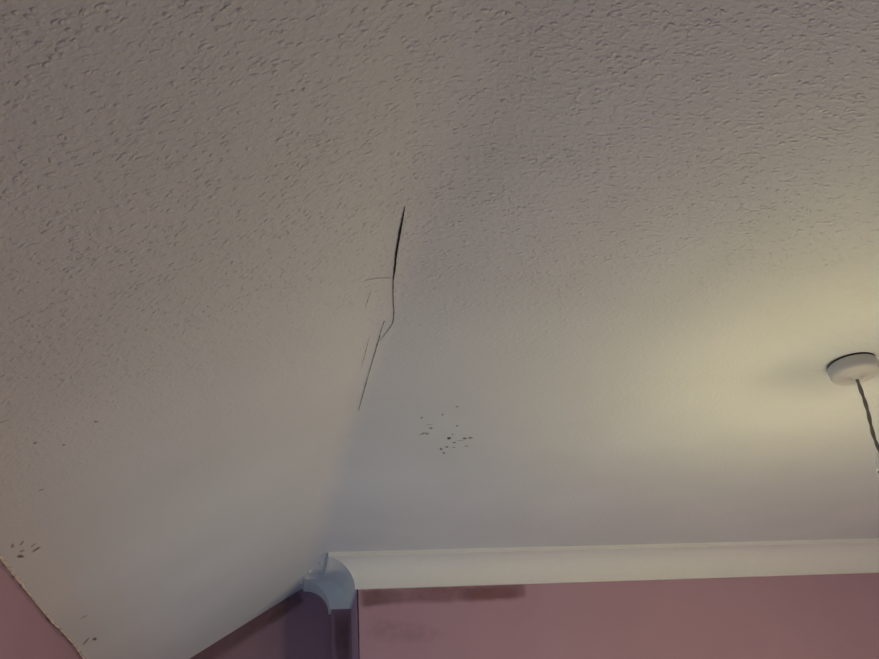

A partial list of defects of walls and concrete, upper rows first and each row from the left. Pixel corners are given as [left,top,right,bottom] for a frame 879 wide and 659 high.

crack [358,207,405,411]